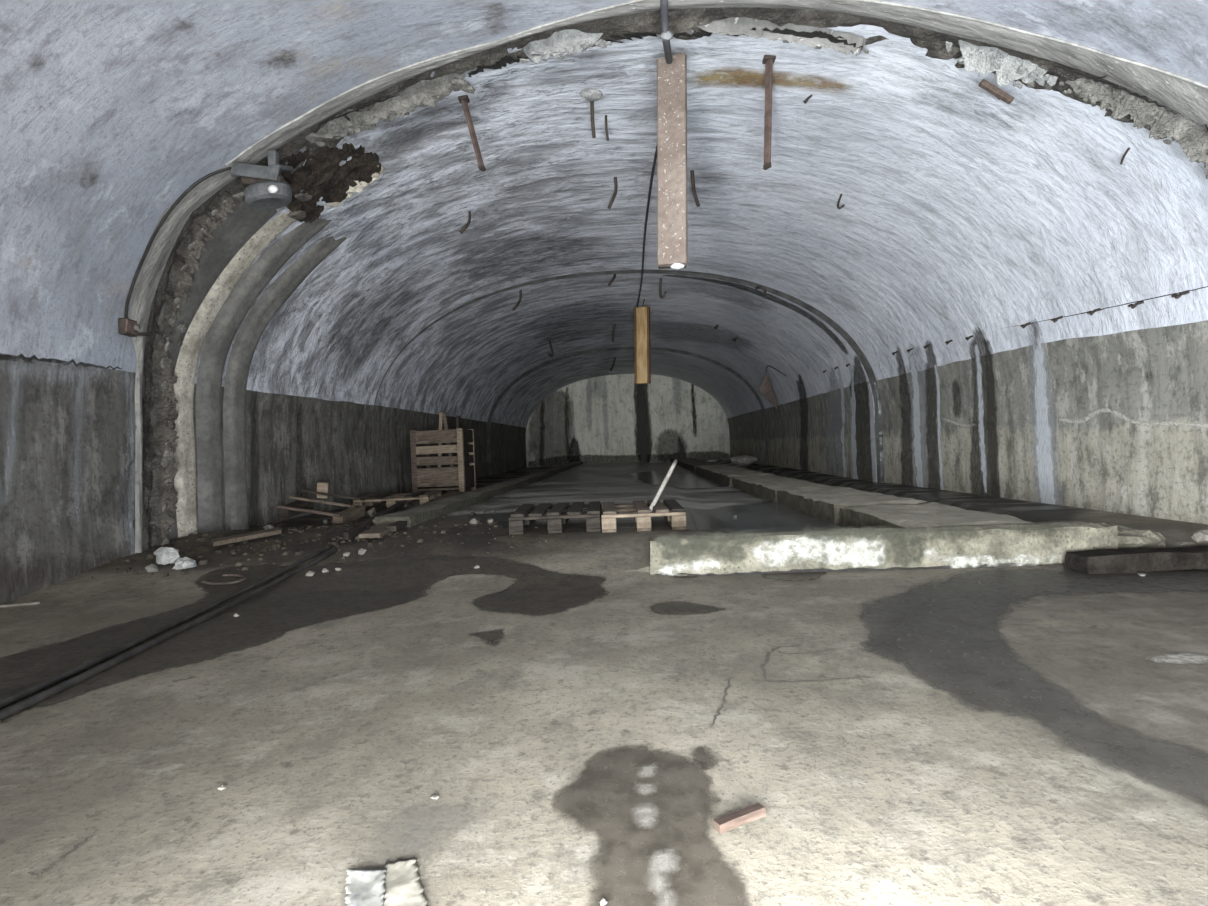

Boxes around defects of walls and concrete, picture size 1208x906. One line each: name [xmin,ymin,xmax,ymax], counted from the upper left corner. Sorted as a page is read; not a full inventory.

spalling [280,73,475,223]
peeling [520,29,612,64]
corrosion [700,69,843,88]
spalling [686,17,869,56]
spalling [946,40,1208,179]
spalling [145,182,247,573]
damp [896,327,1000,497]
damp [0,554,609,723]
crack [709,677,731,727]
crack [760,645,867,682]
damp [860,554,1208,806]
damp [553,746,747,906]